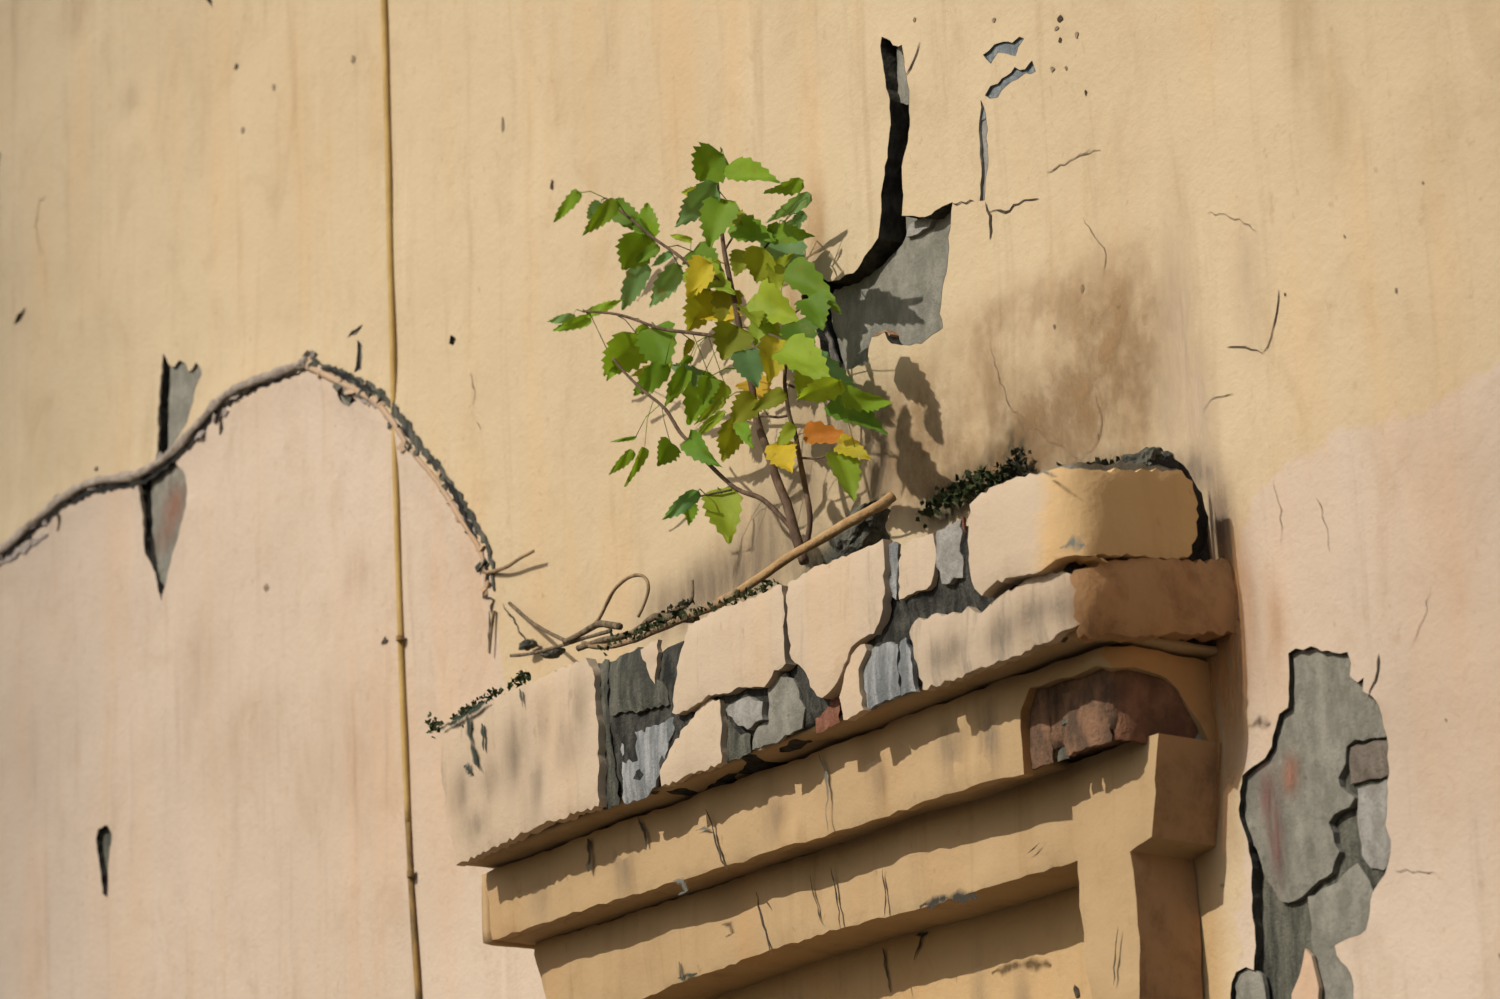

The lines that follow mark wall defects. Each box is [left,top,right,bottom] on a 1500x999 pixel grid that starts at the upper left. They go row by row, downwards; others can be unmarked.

peeling [979,37,1067,201]
peeling [816,37,953,370]
peeling [138,354,202,600]
crack [0,350,525,650]
flaking render [889,541,901,600]
flaking render [934,517,967,585]
water stain [887,283,1140,520]
flaking render [609,639,675,805]
flaking render [726,673,840,763]
flaking render [864,637,920,709]
peeling [96,825,112,897]
peeling [1230,646,1391,999]